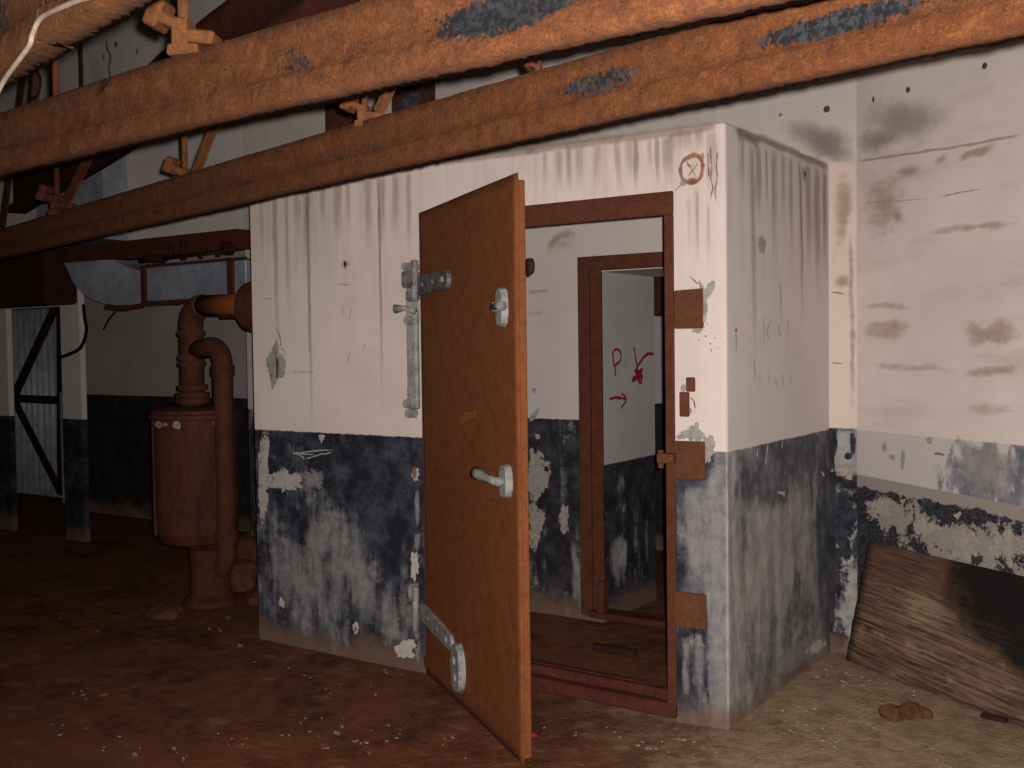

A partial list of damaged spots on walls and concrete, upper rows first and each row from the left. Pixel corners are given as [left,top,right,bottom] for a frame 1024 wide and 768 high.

rust [676,153,705,190]
spalling [266,330,286,391]
peeling [258,431,322,528]
peeling [528,434,552,551]
peeling [558,504,569,535]
peeling [572,550,580,599]
peeling [676,383,742,702]
peeling [829,431,1024,567]